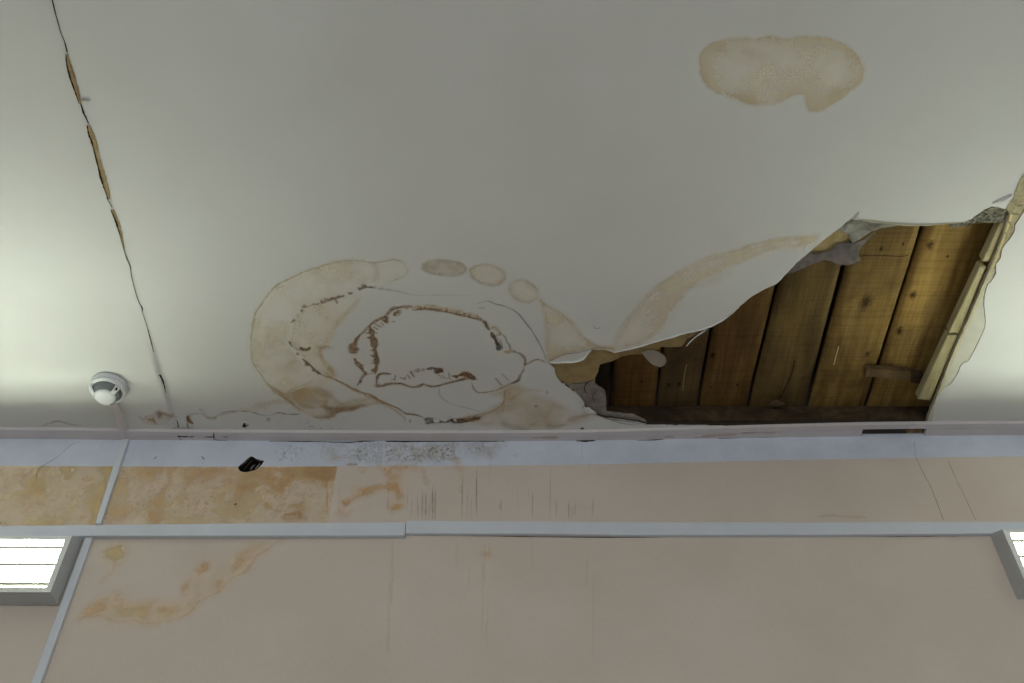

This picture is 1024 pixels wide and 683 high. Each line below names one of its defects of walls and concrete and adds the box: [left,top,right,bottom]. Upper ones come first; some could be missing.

crack [52,0,166,393]
water stain [267,306,534,418]
flaking render [551,331,699,423]
water stain [88,457,338,525]